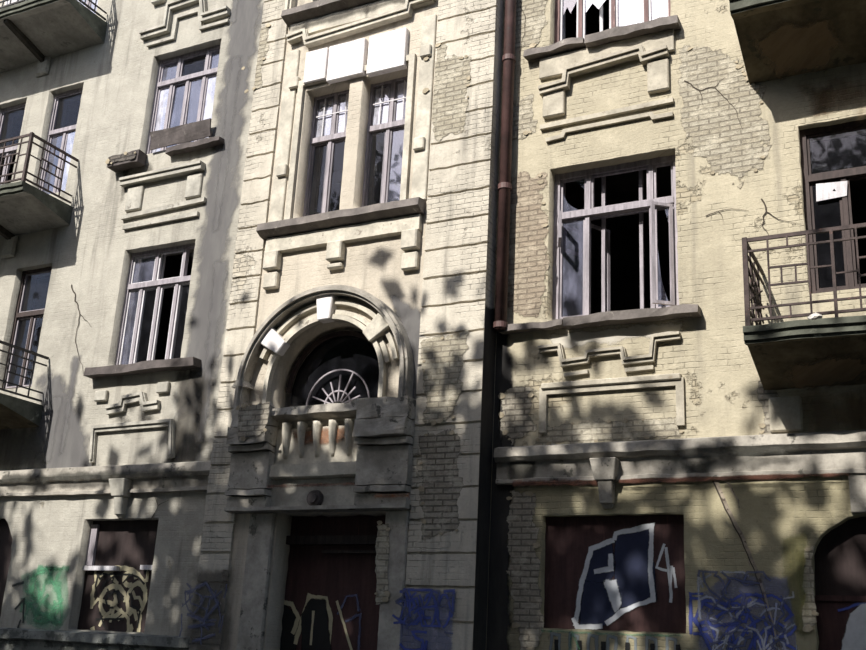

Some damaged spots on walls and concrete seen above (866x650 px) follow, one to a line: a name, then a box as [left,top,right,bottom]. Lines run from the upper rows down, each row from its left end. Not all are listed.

spalling [515,0,547,50]
spalling [512,94,537,140]
crack [684,78,743,129]
spalling [678,45,772,189]
leakage [0,0,263,483]
crack [706,199,801,235]
crack [71,285,88,369]
spalling [235,402,270,442]
spalling [418,330,469,540]
spalling [498,386,684,445]
spalling [374,521,390,605]
spalling [506,490,544,650]